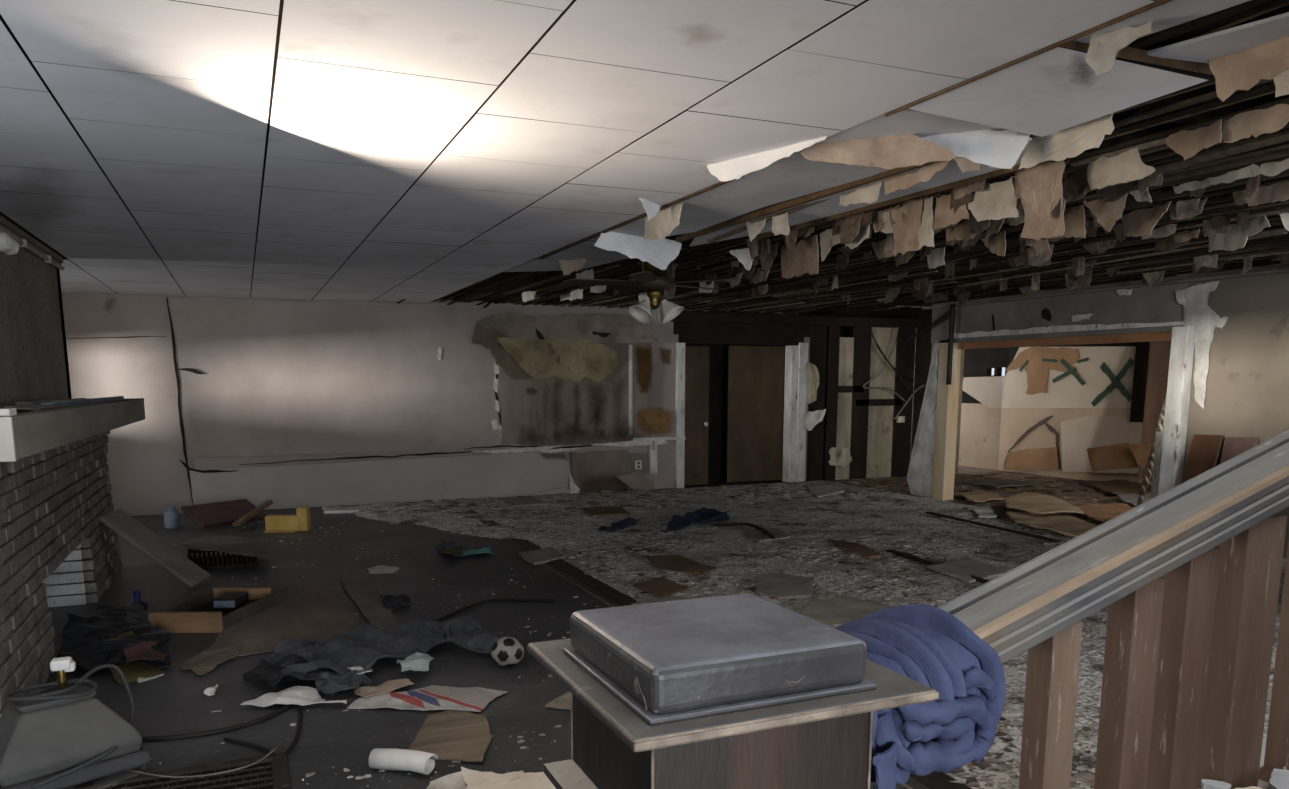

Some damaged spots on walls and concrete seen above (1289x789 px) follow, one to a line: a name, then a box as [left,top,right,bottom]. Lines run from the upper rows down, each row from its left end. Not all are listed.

peeling [1085,20,1153,77]
peeling [1166,36,1289,160]
crack [67,298,668,505]
peeling [522,291,536,302]
flaking render [371,343,866,525]
peeling [558,198,683,301]
peeling [699,113,1289,293]
spalling [948,281,1228,409]